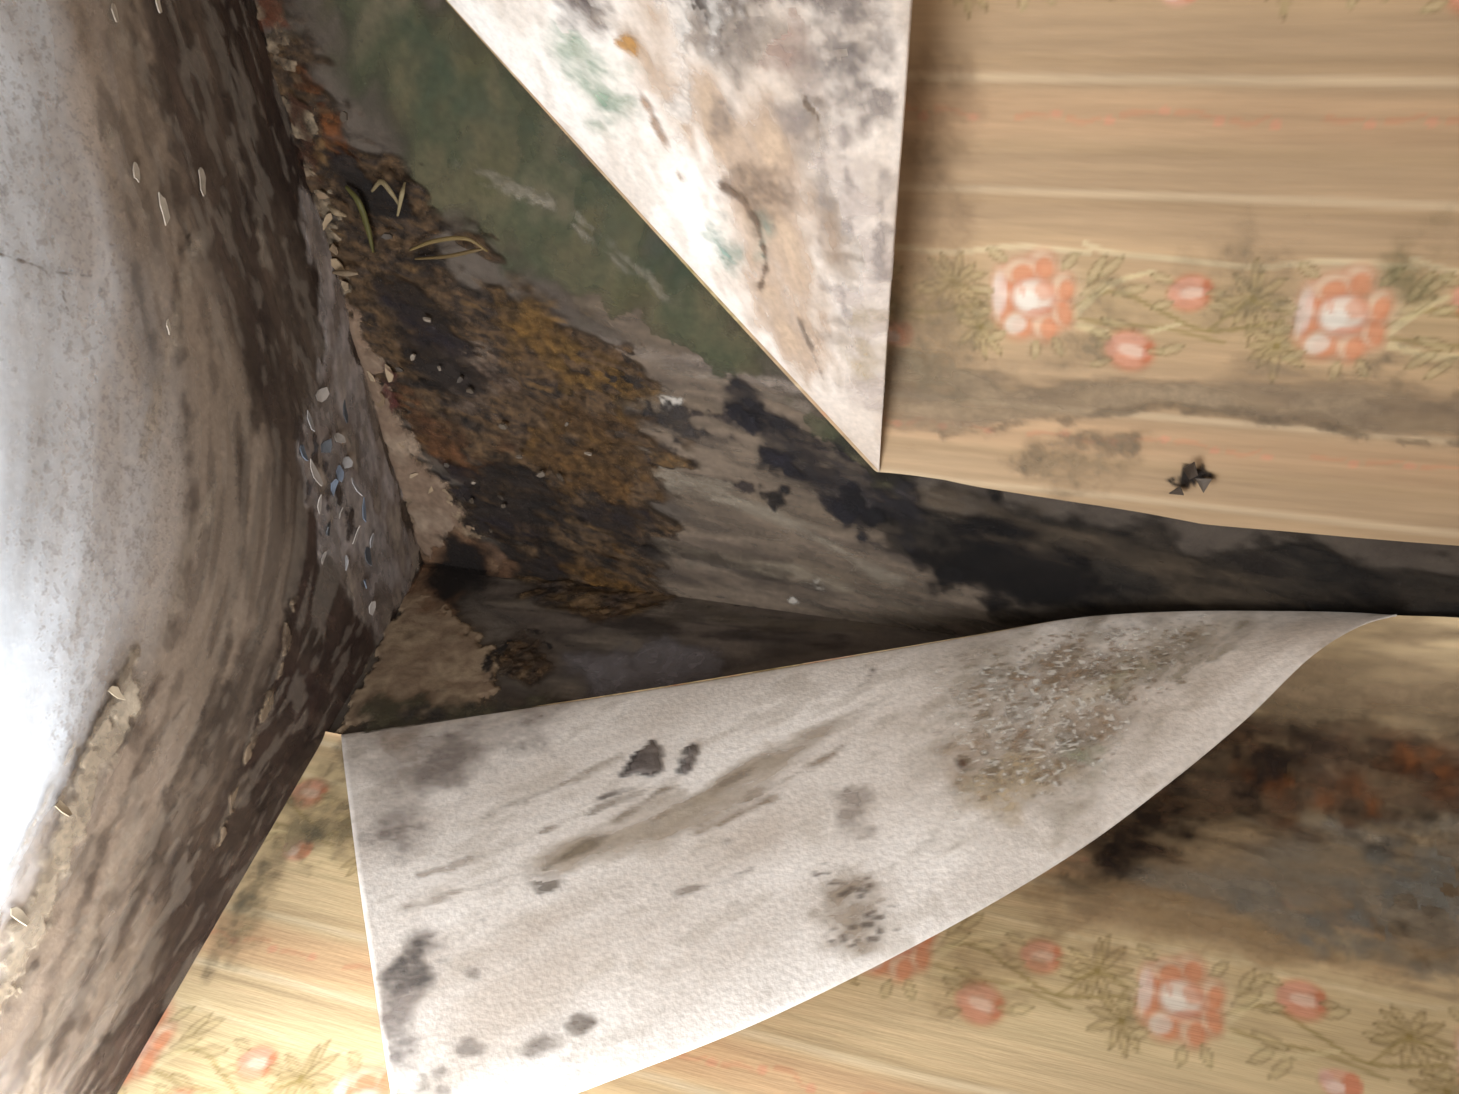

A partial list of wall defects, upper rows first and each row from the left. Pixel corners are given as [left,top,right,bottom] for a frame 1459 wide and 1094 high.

damp [568,0,605,26]
spalling [158,192,170,226]
spalling [198,167,206,196]
damp [633,0,894,373]
spalling [256,0,1039,734]
damp [842,306,1459,435]
damp [0,0,554,1094]
damp [643,378,1459,810]
damp [534,726,835,895]
damp [1062,659,1459,971]
damp [815,873,882,952]